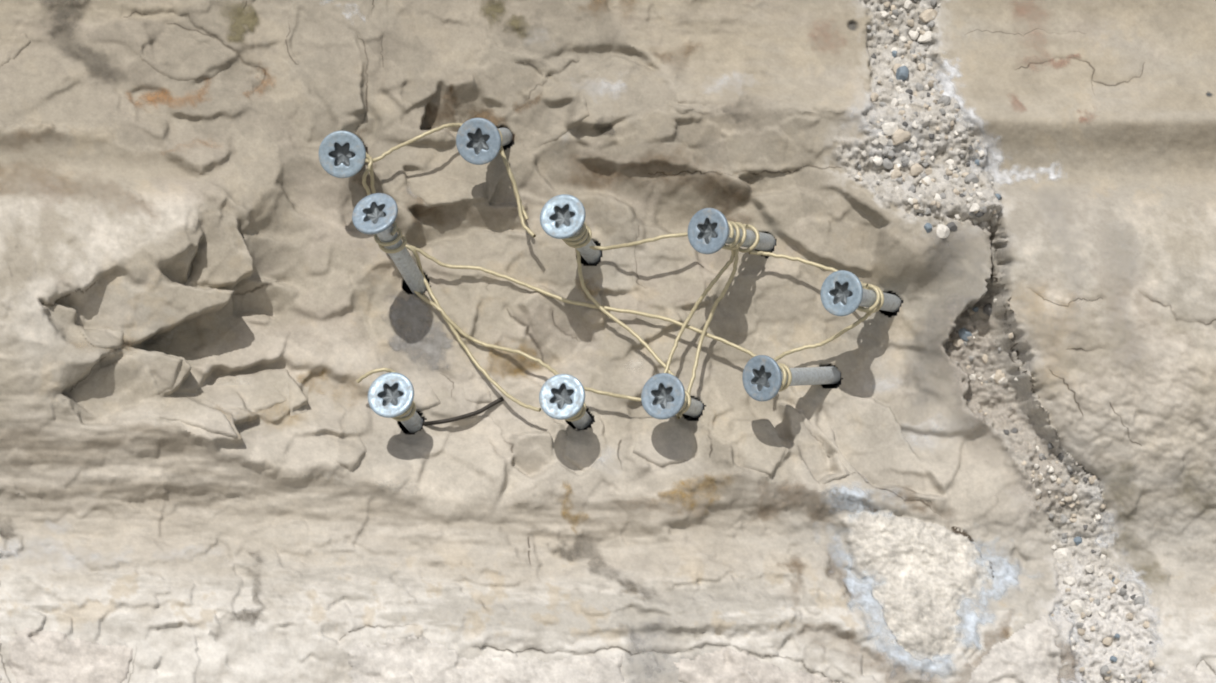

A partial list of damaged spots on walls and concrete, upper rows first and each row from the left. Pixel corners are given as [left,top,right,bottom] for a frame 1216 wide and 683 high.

spalling [0,0,1035,527]